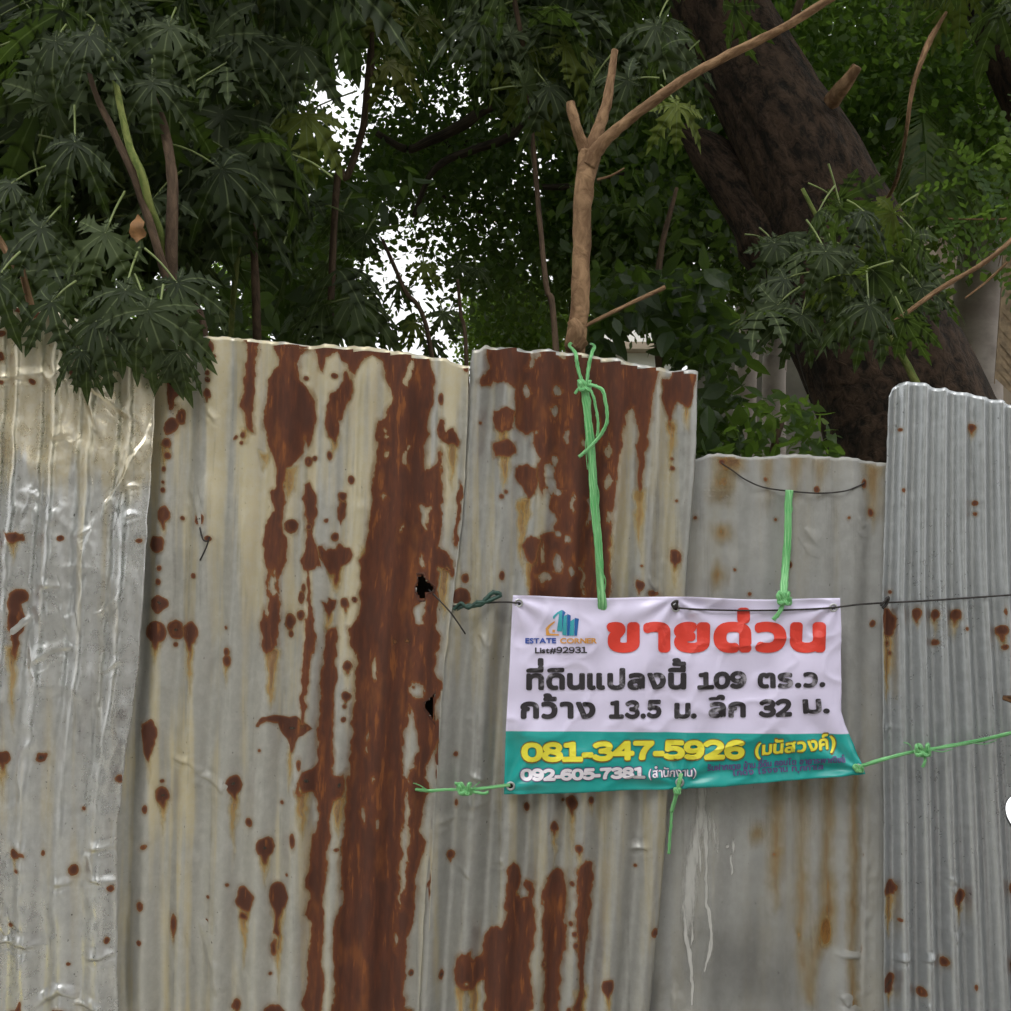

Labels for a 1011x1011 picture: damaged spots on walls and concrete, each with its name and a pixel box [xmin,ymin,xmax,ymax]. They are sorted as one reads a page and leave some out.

corrosion [160,383,186,493]
corrosion [479,348,697,598]
corrosion [136,505,204,553]
corrosion [6,589,29,705]
corrosion [146,565,198,679]
corrosion [233,340,471,1011]
corrosion [869,608,897,692]
corrosion [141,719,158,763]
corrosion [142,779,170,819]
corrosion [225,775,252,832]
corrosion [225,883,254,948]
corrosion [439,845,594,1011]